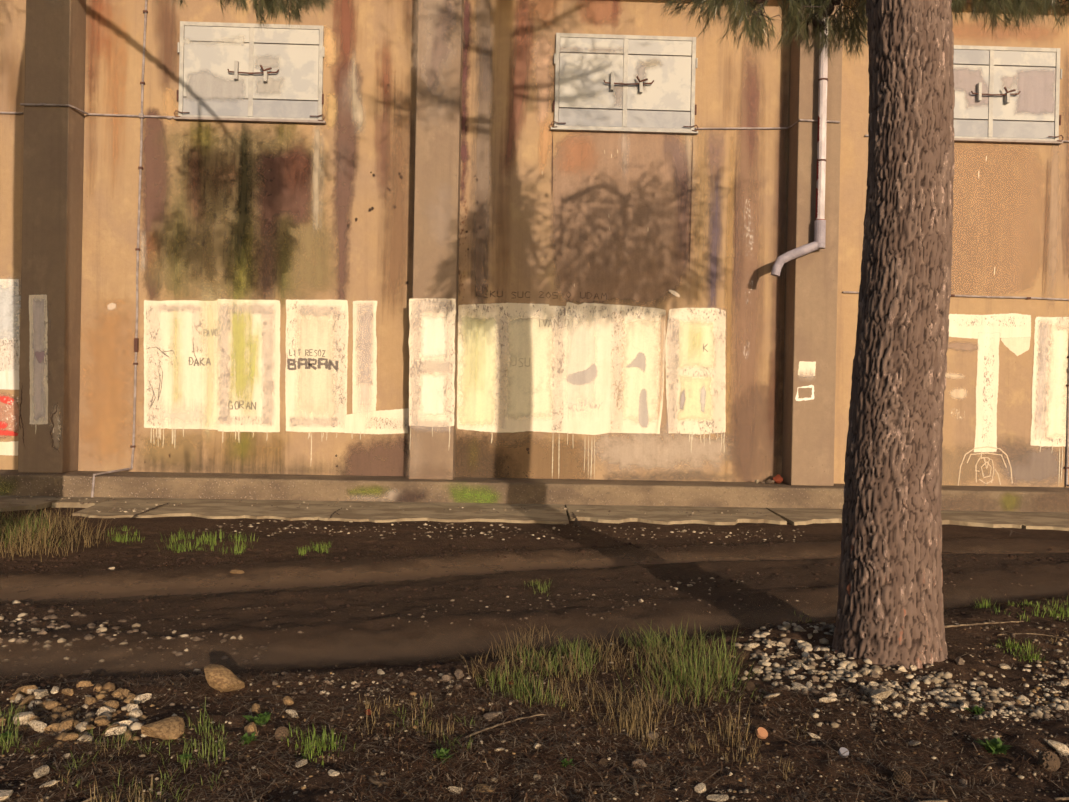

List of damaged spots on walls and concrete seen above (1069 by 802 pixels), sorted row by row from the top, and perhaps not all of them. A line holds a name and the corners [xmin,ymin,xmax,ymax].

water stain [141,0,363,300]
rust [334,0,355,66]
rust [505,0,530,168]